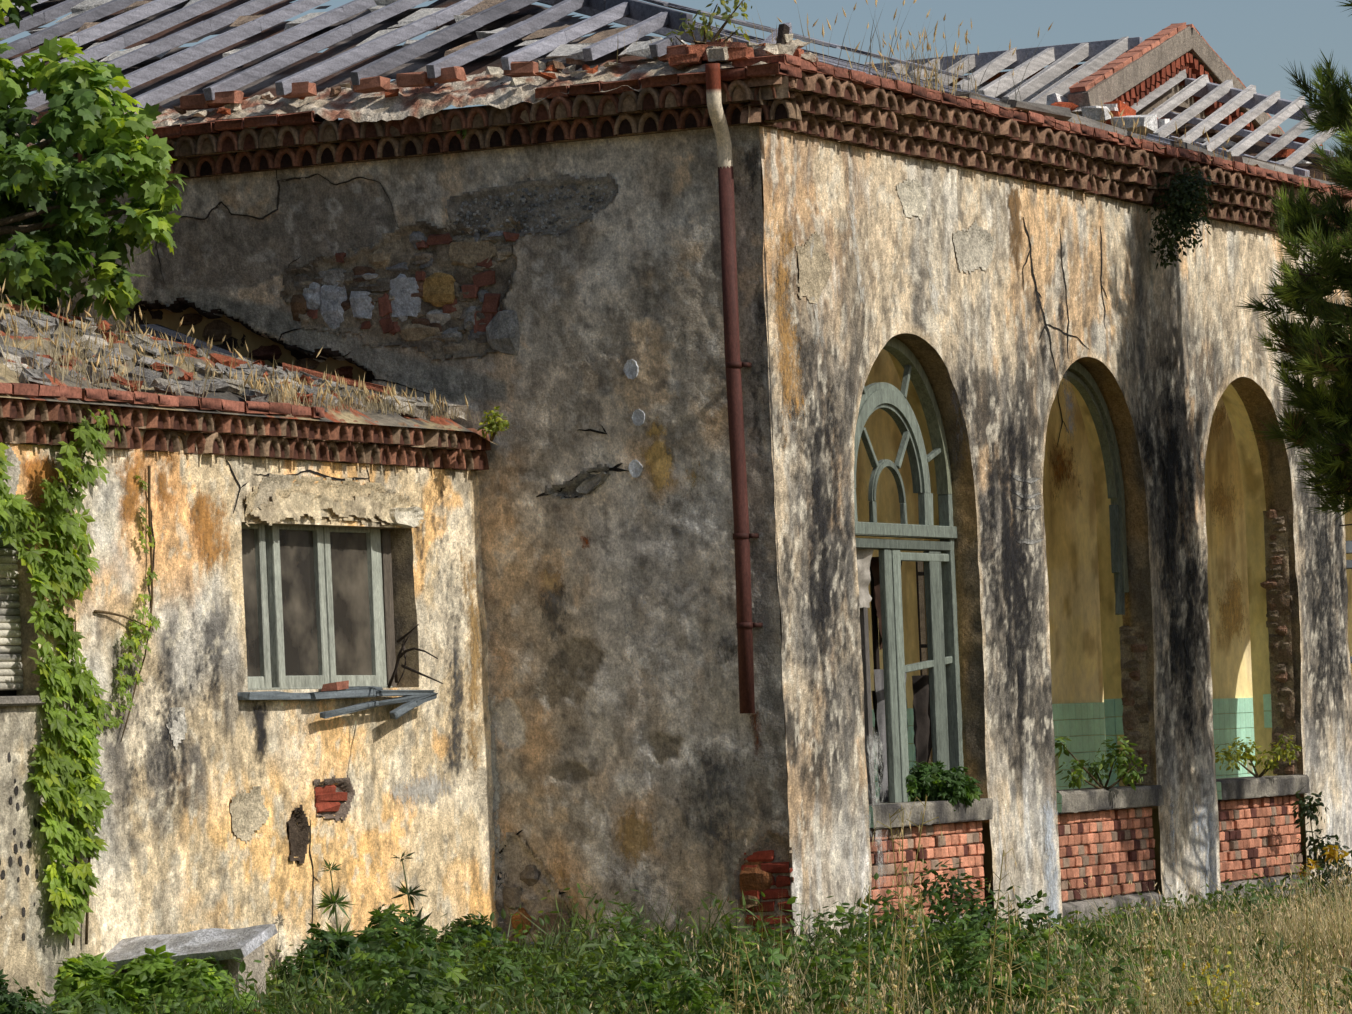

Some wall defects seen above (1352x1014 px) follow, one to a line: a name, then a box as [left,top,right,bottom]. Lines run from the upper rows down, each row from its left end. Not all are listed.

flaking render [128,170,618,382]
crack [1022,217,1107,447]
leakage [747,225,854,719]
leakage [950,375,1037,781]
leakage [1137,353,1245,749]
leakage [1297,449,1349,711]
leakage [123,648,220,817]
flaking render [230,786,270,844]
leakage [253,702,268,758]
flaking render [287,775,355,864]
flaking render [732,830,795,949]
leakage [1044,801,1059,924]